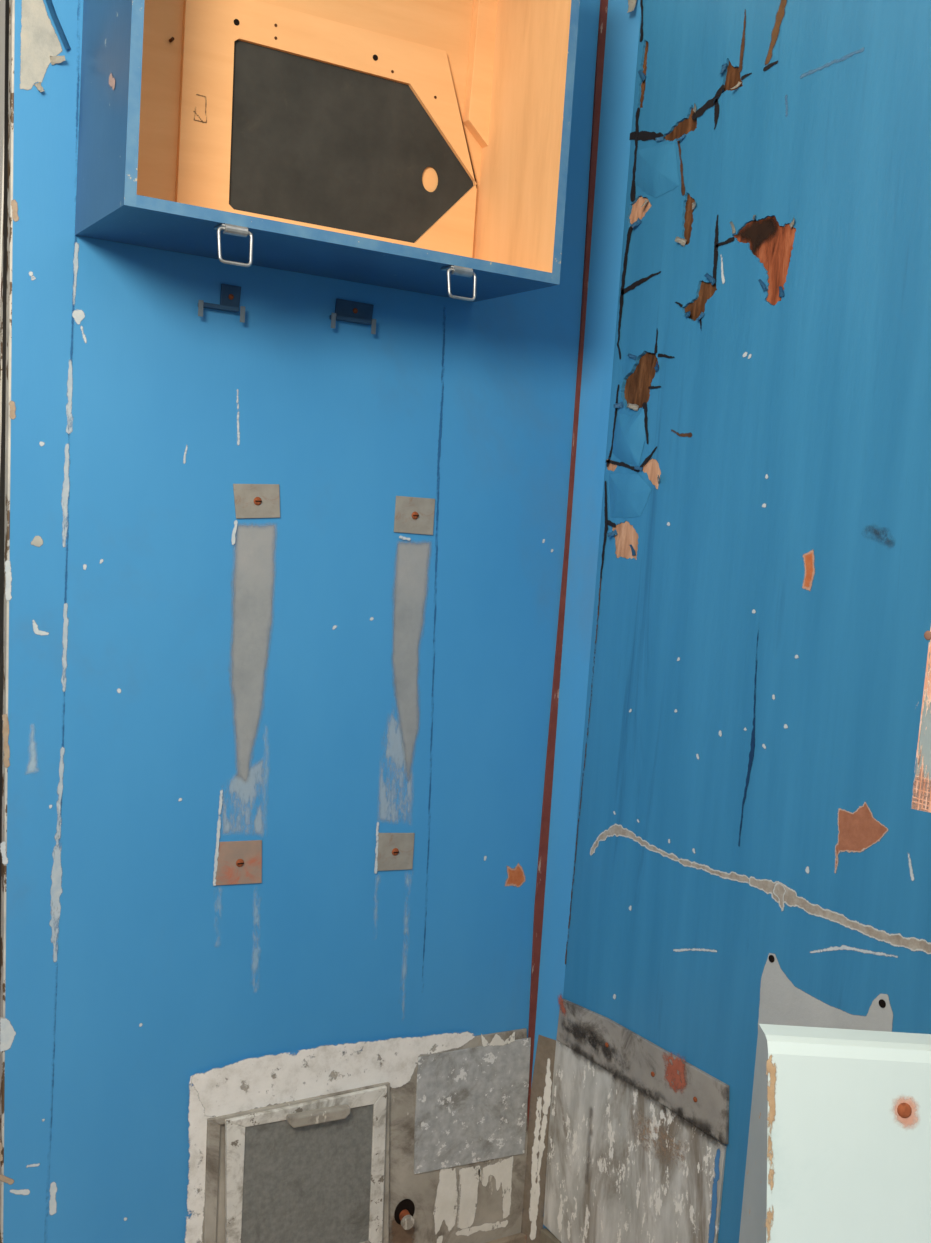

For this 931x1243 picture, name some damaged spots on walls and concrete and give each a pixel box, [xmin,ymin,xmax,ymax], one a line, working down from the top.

crack [637,0,645,42]
crack [565,9,752,964]
crack [738,636,758,846]
rust [505,863,525,887]
peeling [481,1032,515,1047]
peeling [708,1149,720,1243]